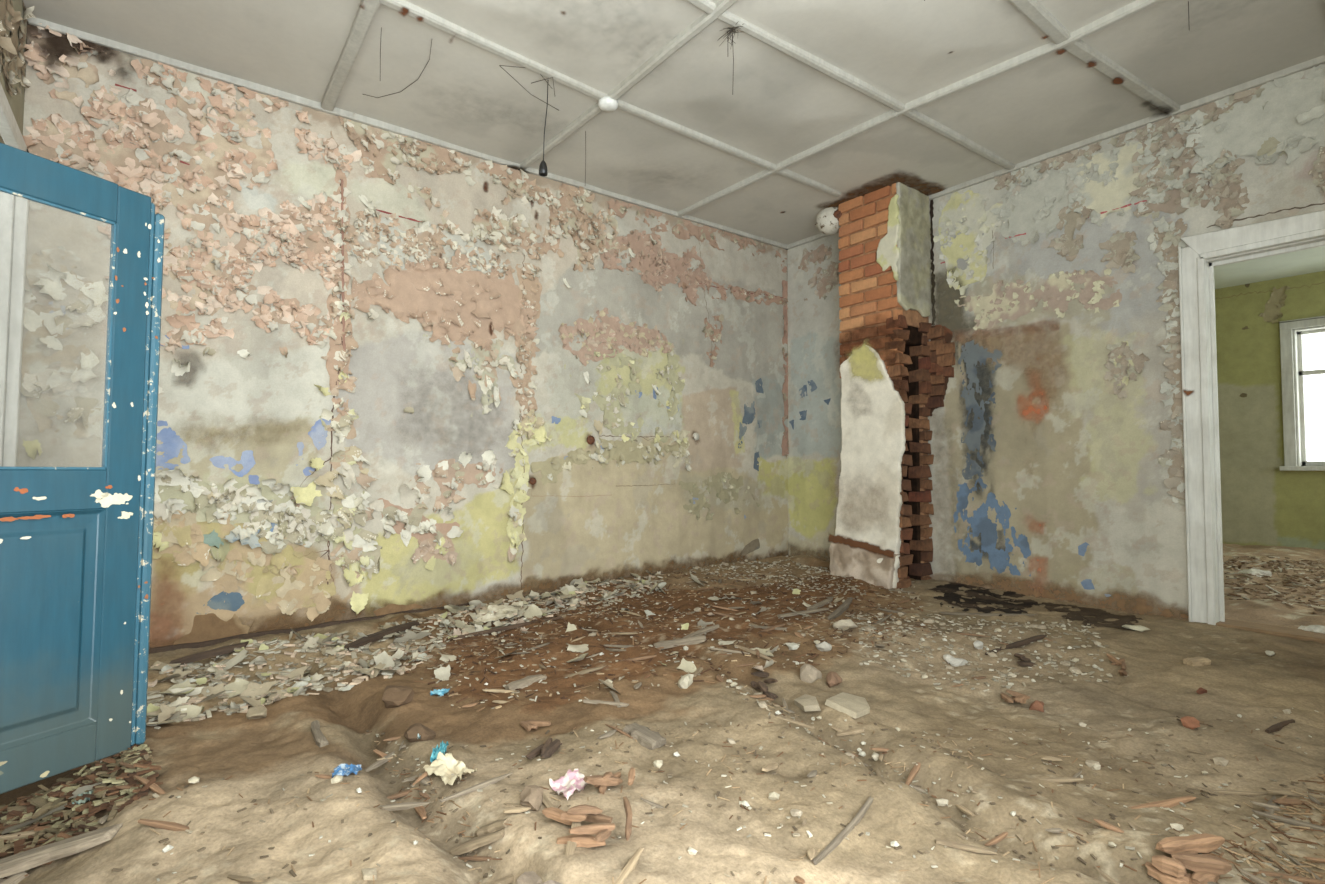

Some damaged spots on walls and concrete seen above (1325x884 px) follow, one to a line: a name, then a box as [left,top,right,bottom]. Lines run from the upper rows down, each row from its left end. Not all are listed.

peeling [933,64,1325,505]
spalling [173,613,250,645]